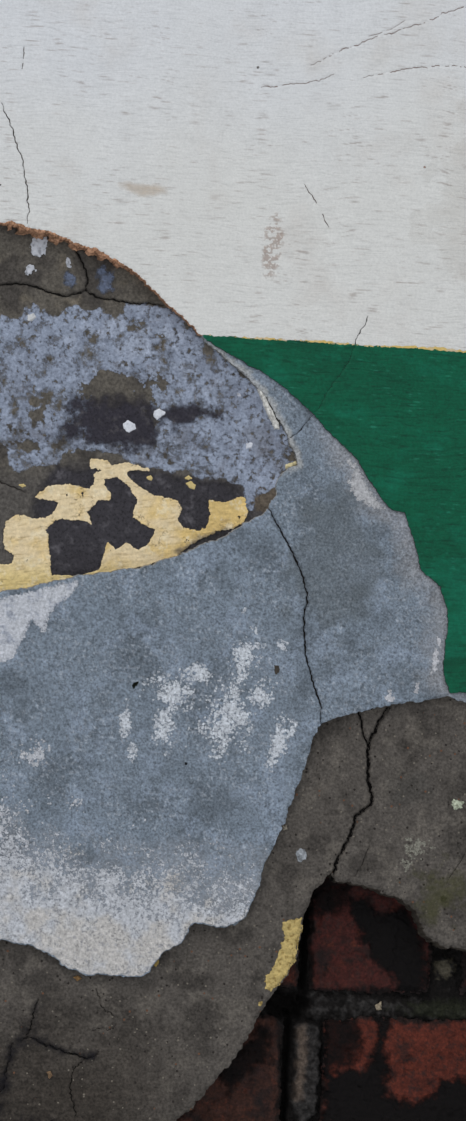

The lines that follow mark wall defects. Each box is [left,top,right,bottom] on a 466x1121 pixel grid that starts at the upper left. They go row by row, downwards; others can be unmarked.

crack [263,6,464,88]
crack [2,104,30,223]
crack [0,251,164,306]
peeling [0,220,294,591]
crack [269,509,322,724]
flaking render [0,338,466,1121]
crack [330,707,388,881]
crack [0,989,115,1116]